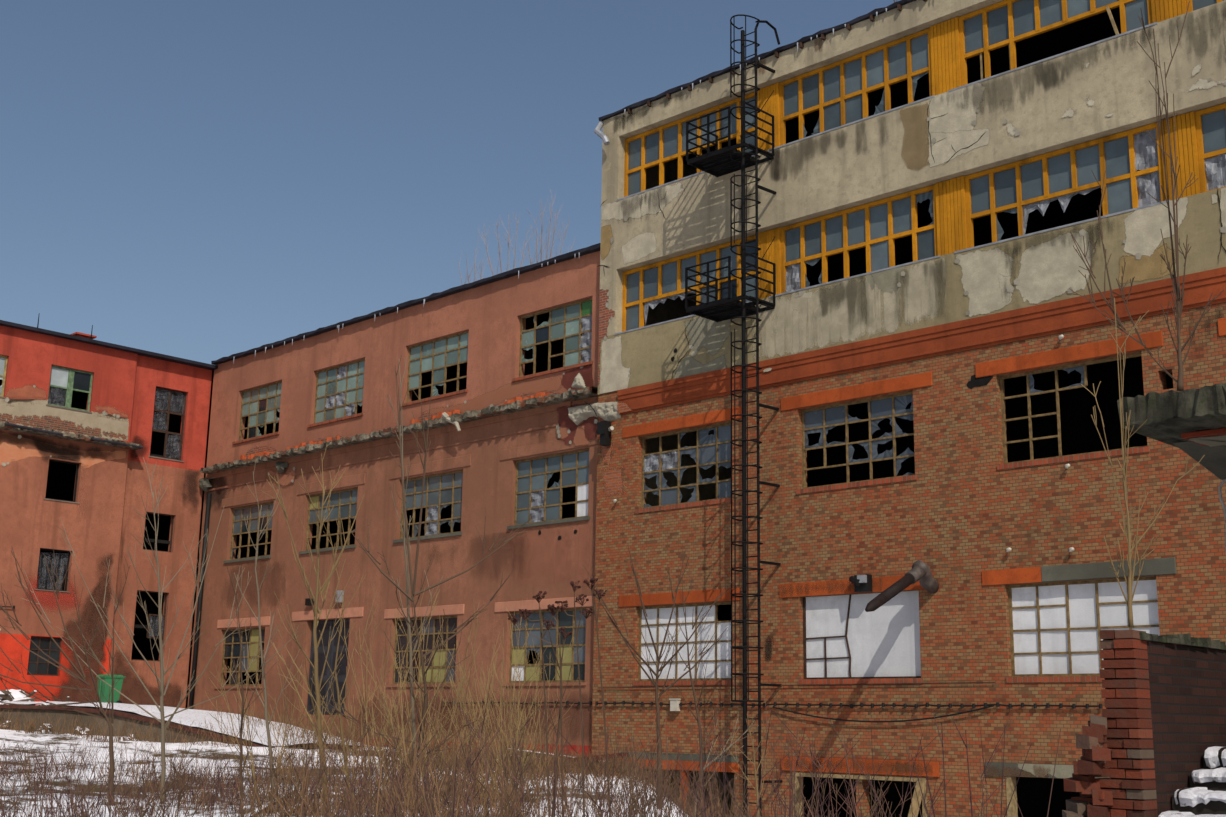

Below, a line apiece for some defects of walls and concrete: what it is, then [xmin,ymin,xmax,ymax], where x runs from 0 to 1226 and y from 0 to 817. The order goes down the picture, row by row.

crack [927,103,985,164]
peeling [927,83,990,167]
peeling [1123,197,1188,260]
peeling [1211,188,1226,233]
damp [759,258,945,357]
peeling [955,229,1095,317]
damp [35,440,78,461]
flaking render [0,385,129,468]
peeling [411,336,632,446]
spalling [1017,714,1113,817]